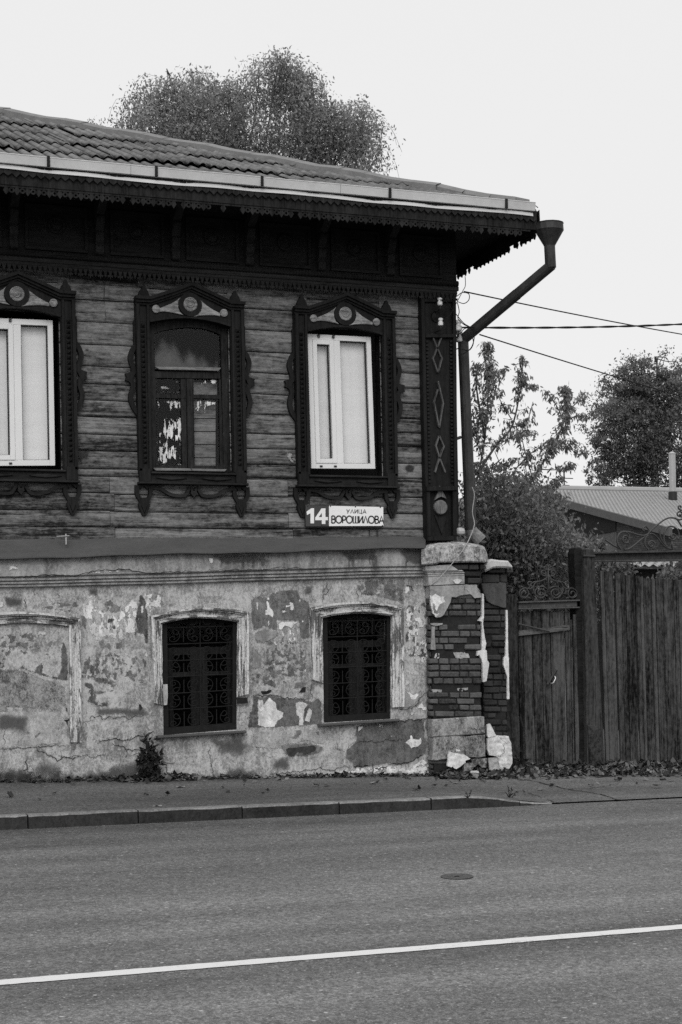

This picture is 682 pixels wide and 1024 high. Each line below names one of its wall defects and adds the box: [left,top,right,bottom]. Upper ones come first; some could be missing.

crack [2,715,145,775]
flaking render [40,593,161,657]
flaking render [236,589,323,756]
flaking render [346,547,513,773]